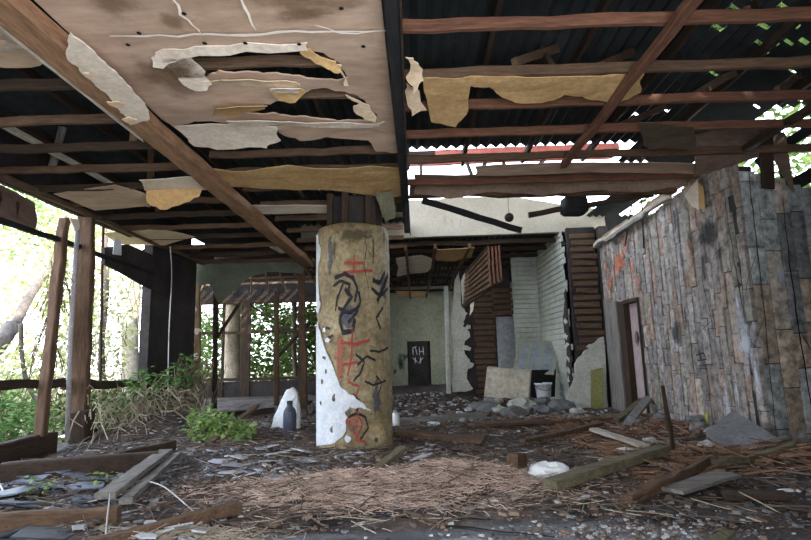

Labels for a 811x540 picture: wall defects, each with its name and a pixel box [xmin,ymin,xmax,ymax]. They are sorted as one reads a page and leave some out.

crack [109,0,386,38]
peeling [151,42,384,128]
peeling [316,234,371,446]
spalling [451,273,474,392]
spalling [563,289,608,408]